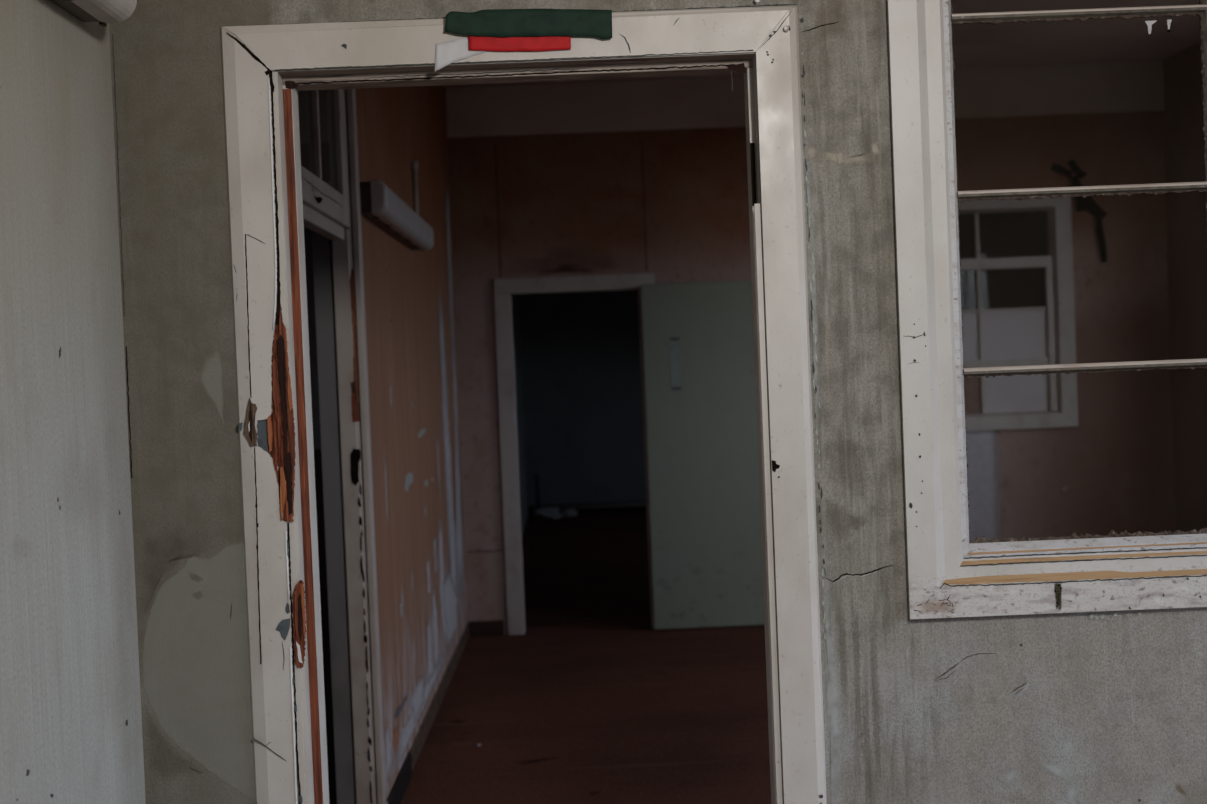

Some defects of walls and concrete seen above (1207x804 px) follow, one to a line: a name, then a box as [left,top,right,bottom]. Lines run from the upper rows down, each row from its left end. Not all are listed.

peeling [357,196,464,804]
crack [822,565,893,583]